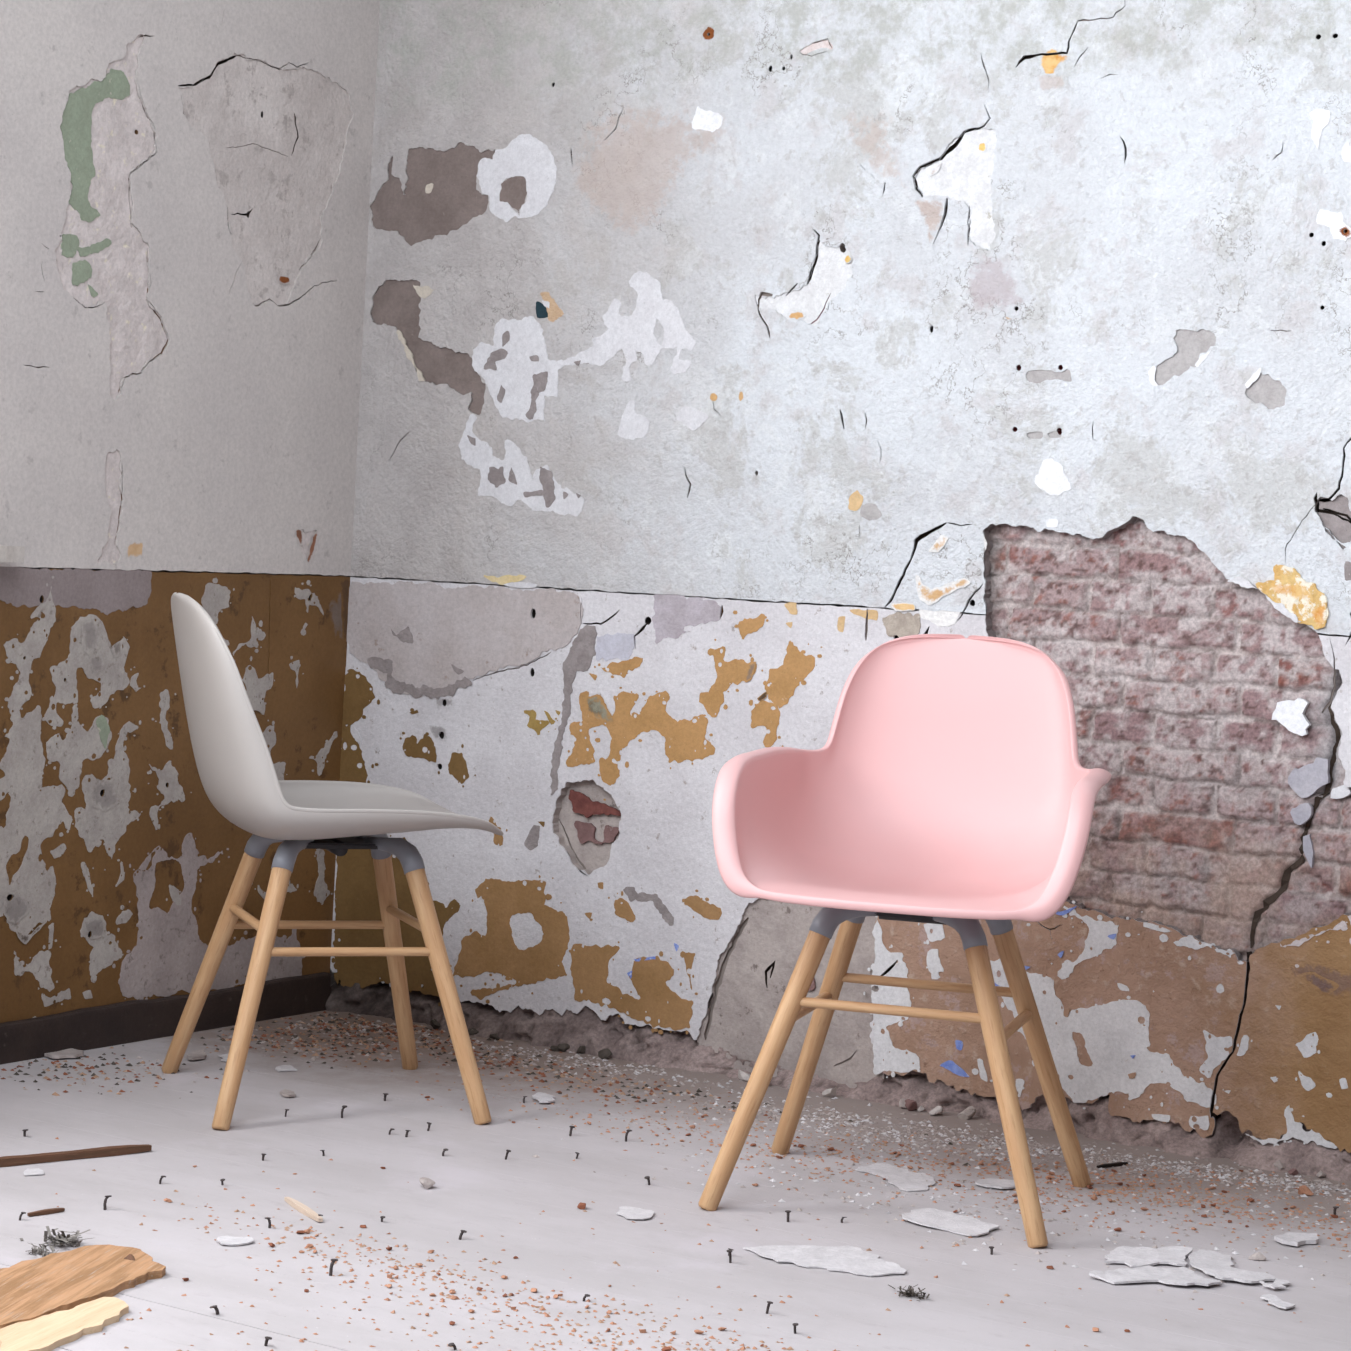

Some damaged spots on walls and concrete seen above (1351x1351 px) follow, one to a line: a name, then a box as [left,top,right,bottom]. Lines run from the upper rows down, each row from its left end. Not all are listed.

crack [982,10,1121,80]
peeling [55,34,169,399]
flaking render [370,142,495,246]
flaking render [371,280,486,415]
crack [1285,439,1351,552]
peeling [0,566,235,1018]
peeling [287,849,396,1021]
peeling [391,854,449,1032]
flaking render [309,575,822,926]
flaking render [433,875,823,1081]
flaking render [809,516,1351,1181]
crack [1210,614,1351,1117]